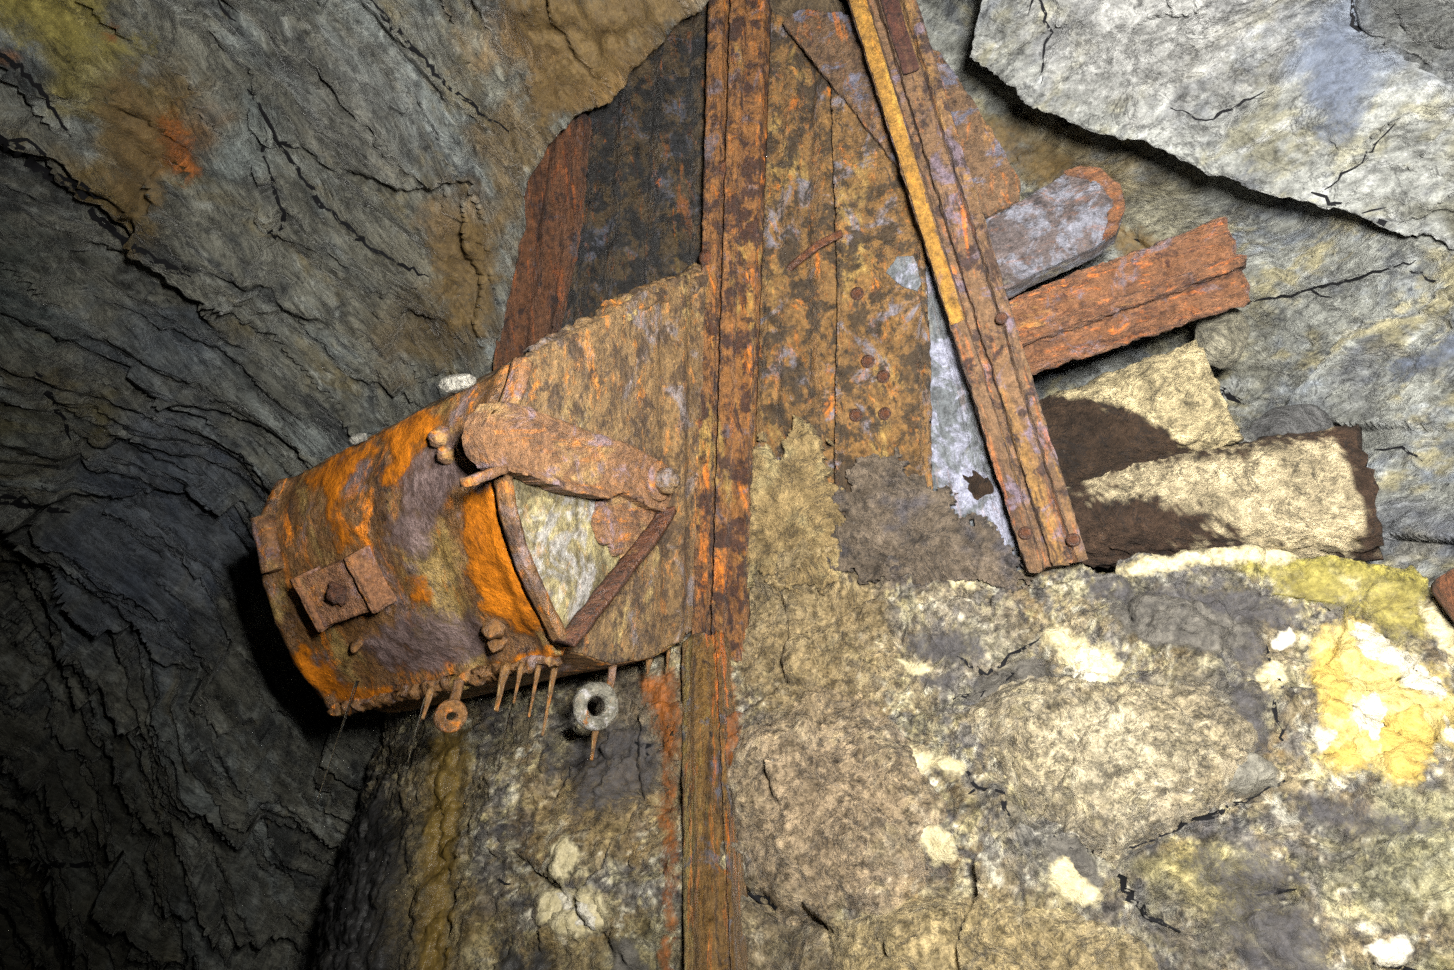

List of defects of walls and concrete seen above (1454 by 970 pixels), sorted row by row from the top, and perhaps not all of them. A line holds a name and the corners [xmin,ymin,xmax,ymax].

crack [1170,90,1265,121]
crack [1311,123,1395,227]
crack [1250,260,1436,302]
corrosion [305,409,438,546]
corrosion [411,576,431,603]
corrosion [463,483,555,664]
corrosion [292,644,391,701]
corrosion [642,670,678,970]